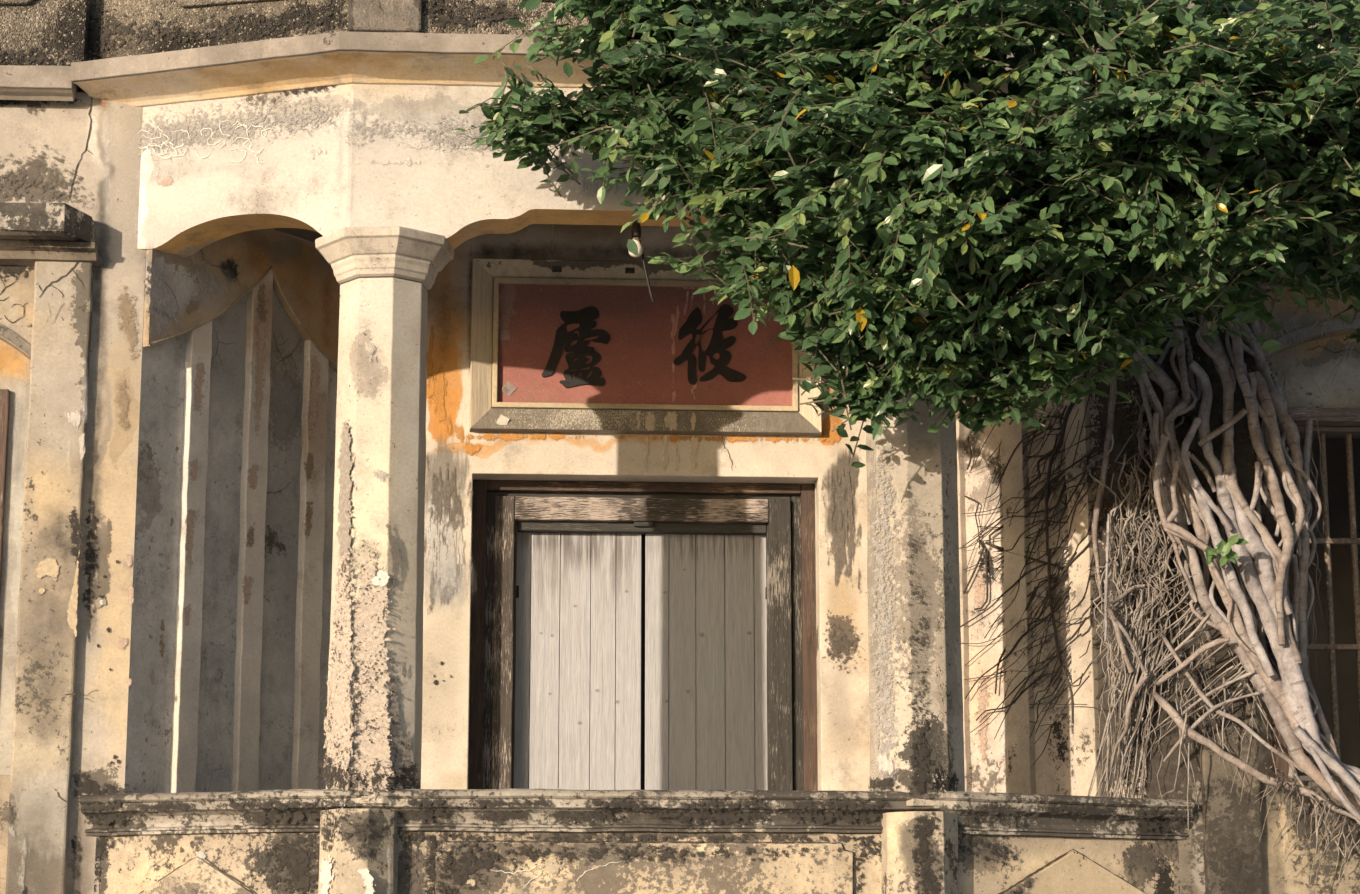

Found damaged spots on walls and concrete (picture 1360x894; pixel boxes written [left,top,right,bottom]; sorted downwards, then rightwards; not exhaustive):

water stain [0,144,93,209]
crack [68,96,93,198]
peeling [114,381,130,430]
peeling [427,312,584,455]
peeling [67,518,98,637]
peeling [424,455,473,613]
water stain [822,623,865,673]
water stain [0,801,39,894]
water stain [68,772,195,894]
peeling [541,855,566,875]
water stain [153,721,960,894]
water stain [958,801,1029,869]